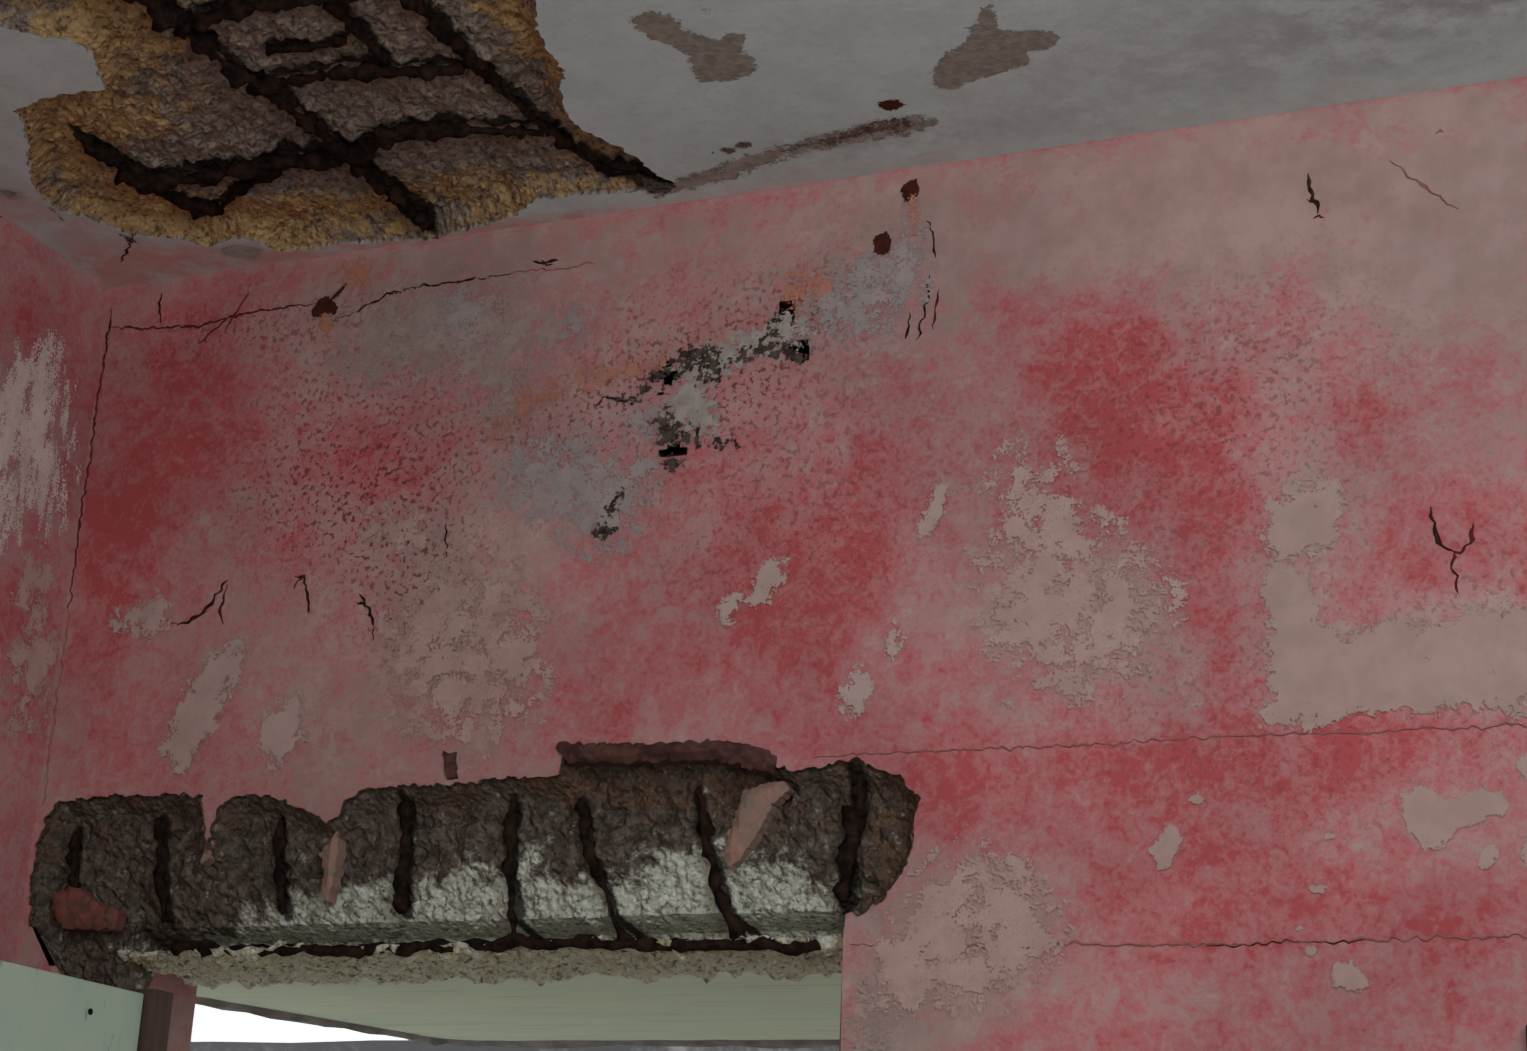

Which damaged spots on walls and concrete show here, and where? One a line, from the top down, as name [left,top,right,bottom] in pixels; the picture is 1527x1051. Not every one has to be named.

peeling [627,11,759,83]
peeling [933,4,1060,90]
spalling [0,0,674,259]
water stain [637,115,940,199]
rust [873,231,892,256]
rust [900,179,921,235]
crack [1307,174,1324,219]
flaking render [606,309,819,473]
crack [42,259,595,804]
peeling [916,481,949,540]
crack [1429,506,1476,594]
spalling [29,493,1077,1051]